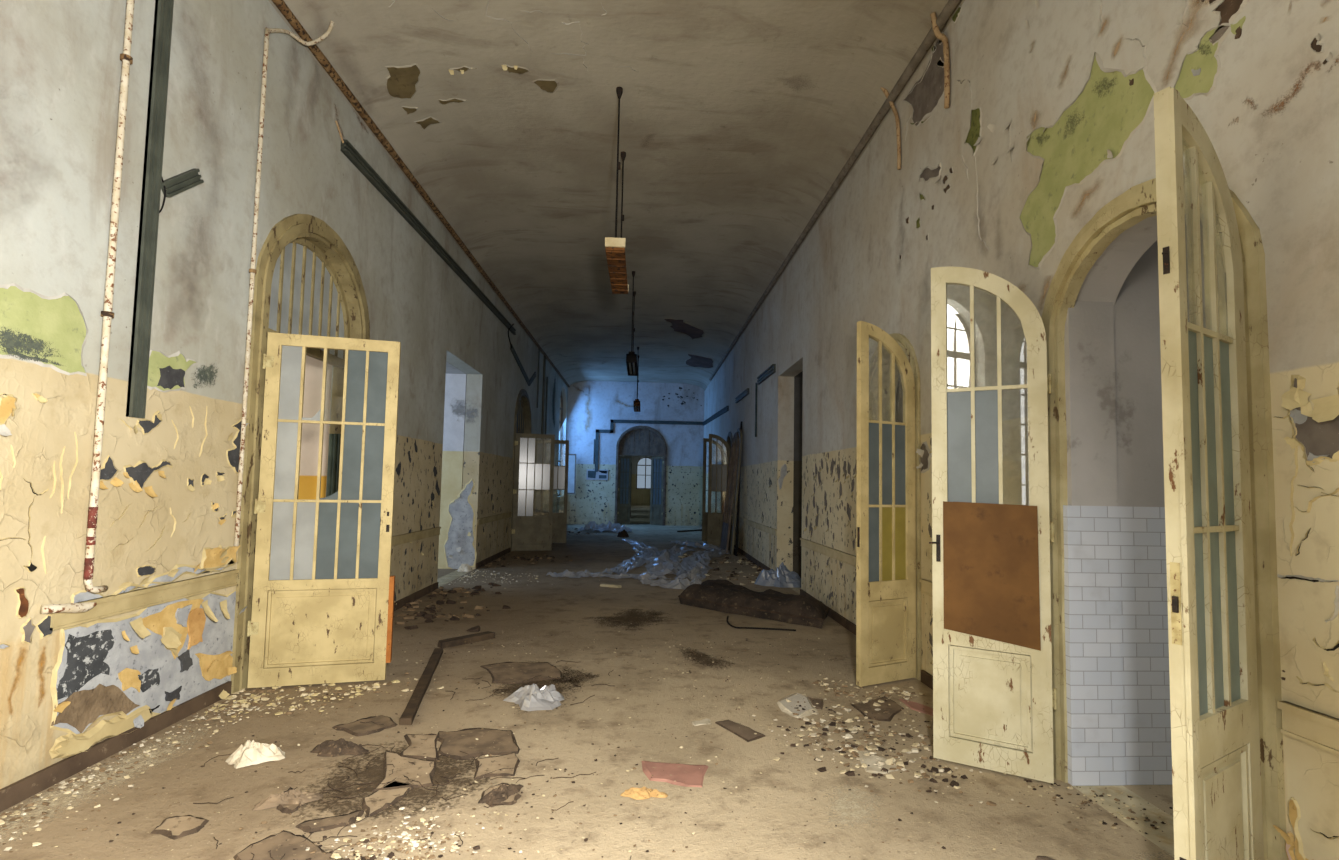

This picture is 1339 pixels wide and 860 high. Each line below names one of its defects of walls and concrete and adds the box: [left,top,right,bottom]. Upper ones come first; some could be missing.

peeling [1174,0,1248,100]
peeling [385,64,468,130]
peeling [964,52,1157,269]
peeling [0,283,89,376]
crack [0,432,78,574]
peeling [99,455,173,497]
crack [112,503,191,550]
crack [172,406,208,457]
peeling [187,418,249,492]
crack [1273,384,1339,693]
peeling [1281,375,1339,466]
spalling [0,560,247,759]